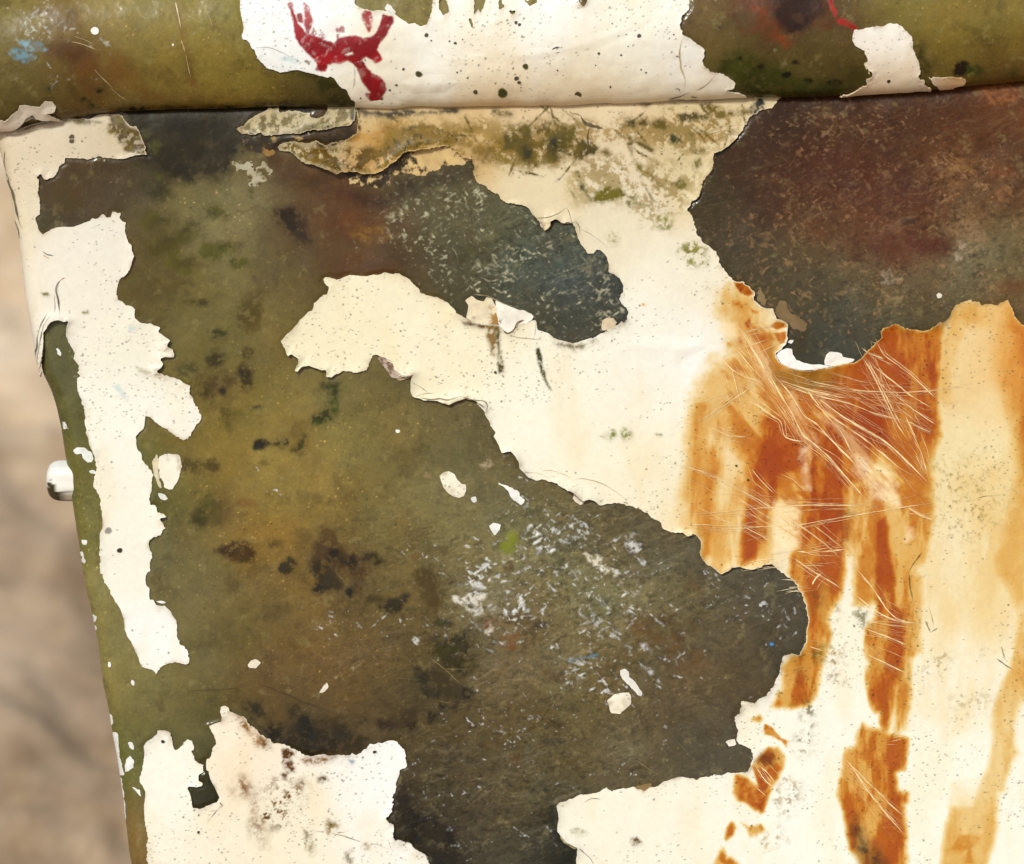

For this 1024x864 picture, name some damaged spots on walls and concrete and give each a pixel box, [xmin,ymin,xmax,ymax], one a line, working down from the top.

peeling [0,0,328,128]
rust [302,196,406,280]
water stain [237,97,767,237]
mould [674,236,711,270]
peeling [669,0,1024,371]
peeling [35,135,809,864]
rust [671,105,1024,864]
rust [622,609,718,680]